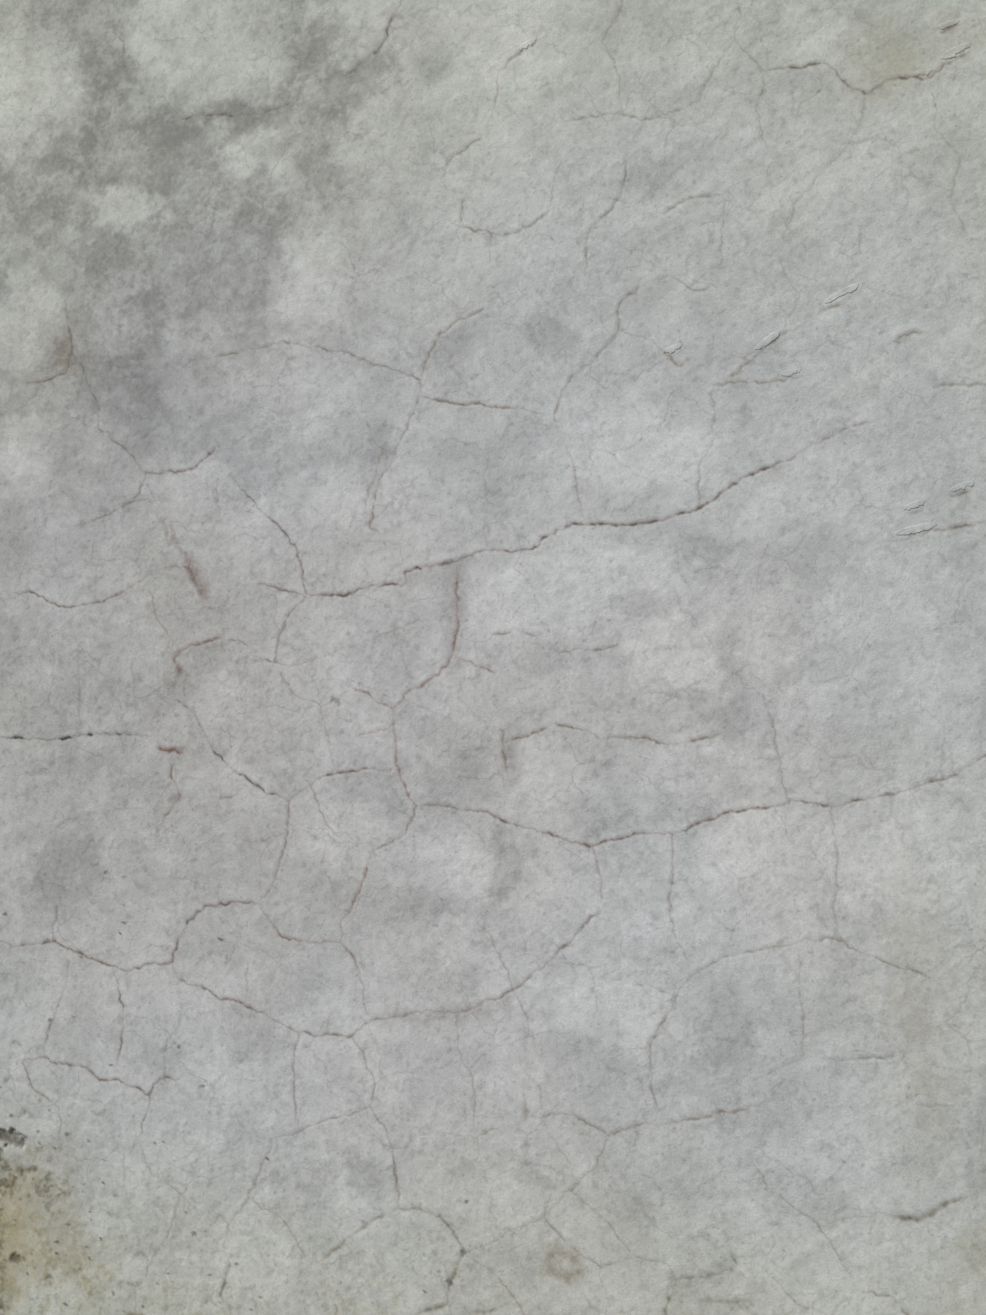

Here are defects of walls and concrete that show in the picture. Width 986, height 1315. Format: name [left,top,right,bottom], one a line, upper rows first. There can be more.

crack [505,467,769,551]
crack [323,562,457,597]